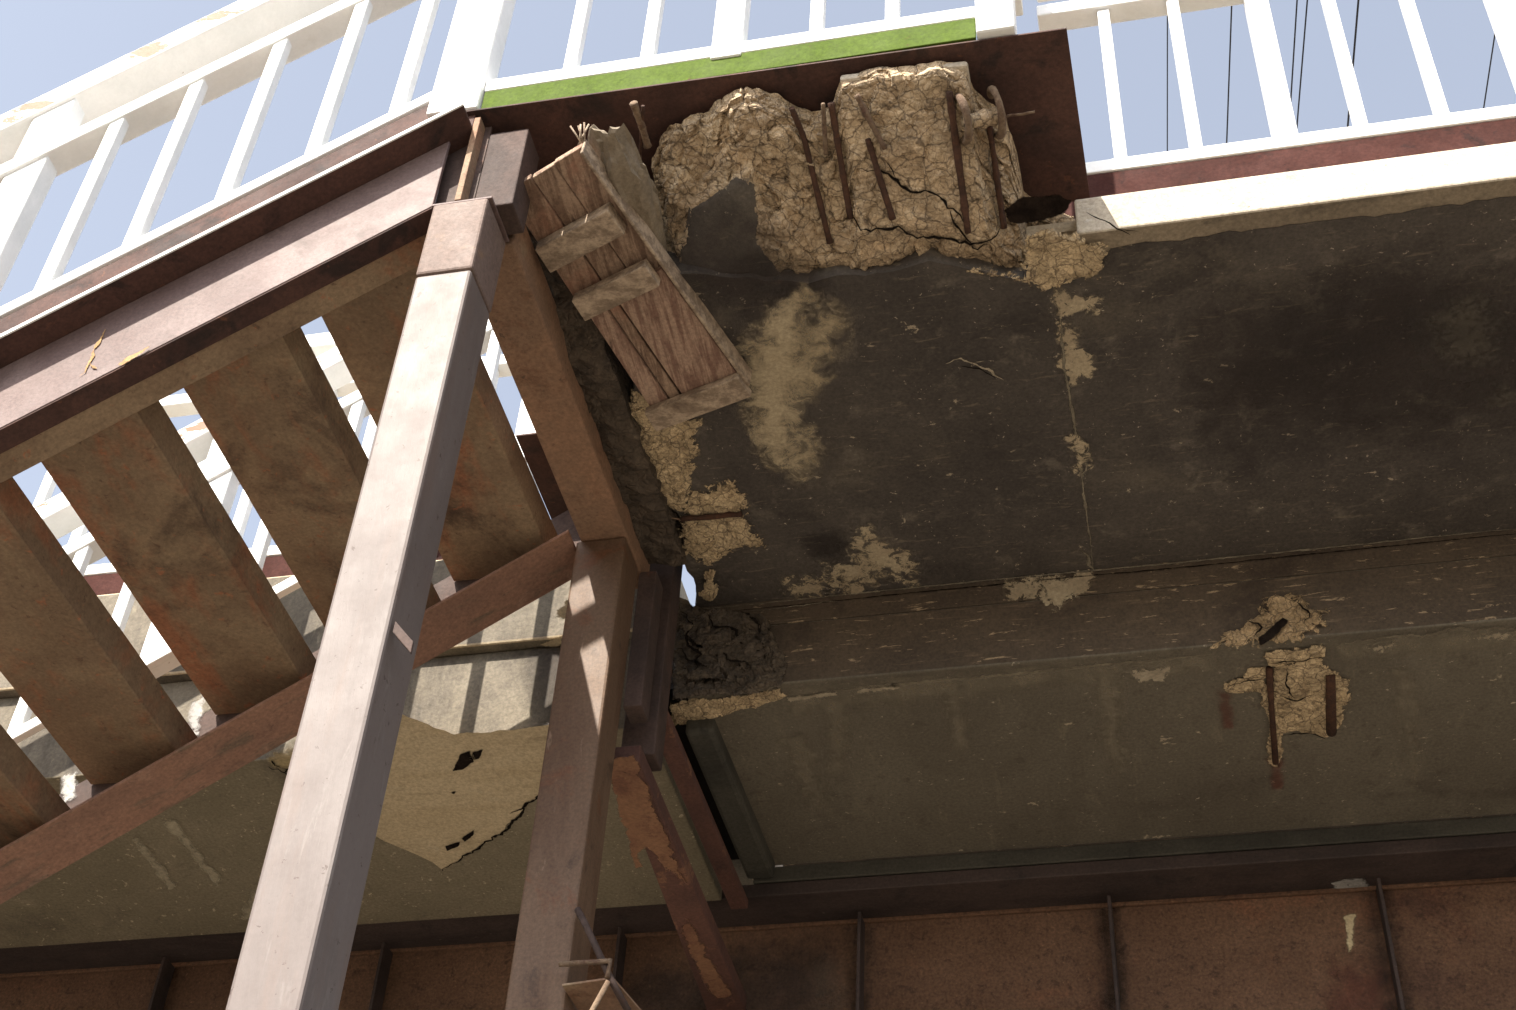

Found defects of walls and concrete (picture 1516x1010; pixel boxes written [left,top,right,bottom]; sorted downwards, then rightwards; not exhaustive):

crack [853,160,1001,250]
spalling [629,61,1108,481]
spalling [525,224,837,726]
peeling [782,523,920,599]
peeling [1003,569,1095,613]
spalling [1210,592,1351,767]
peeling [376,714,549,869]
corrosion [611,755,686,884]
corrosion [680,919,733,1001]